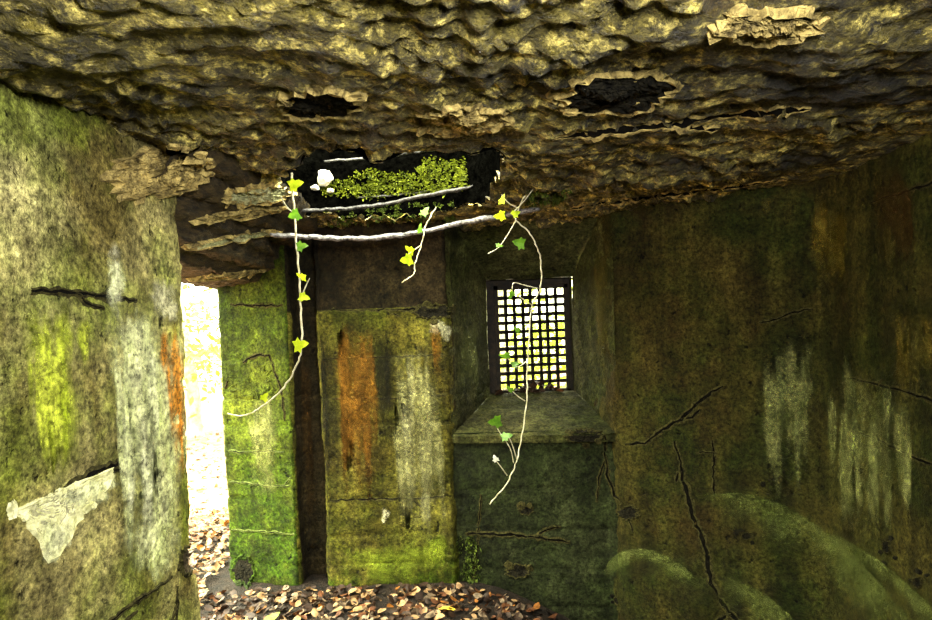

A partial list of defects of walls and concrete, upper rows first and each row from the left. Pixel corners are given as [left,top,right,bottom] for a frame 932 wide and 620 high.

peeling [6,467,114,564]
corrosion [161,334,184,448]
crack [579,386,742,620]
water stain [765,353,808,462]
water stain [828,382,890,507]
water stain [896,419,910,496]
crack [108,576,180,620]